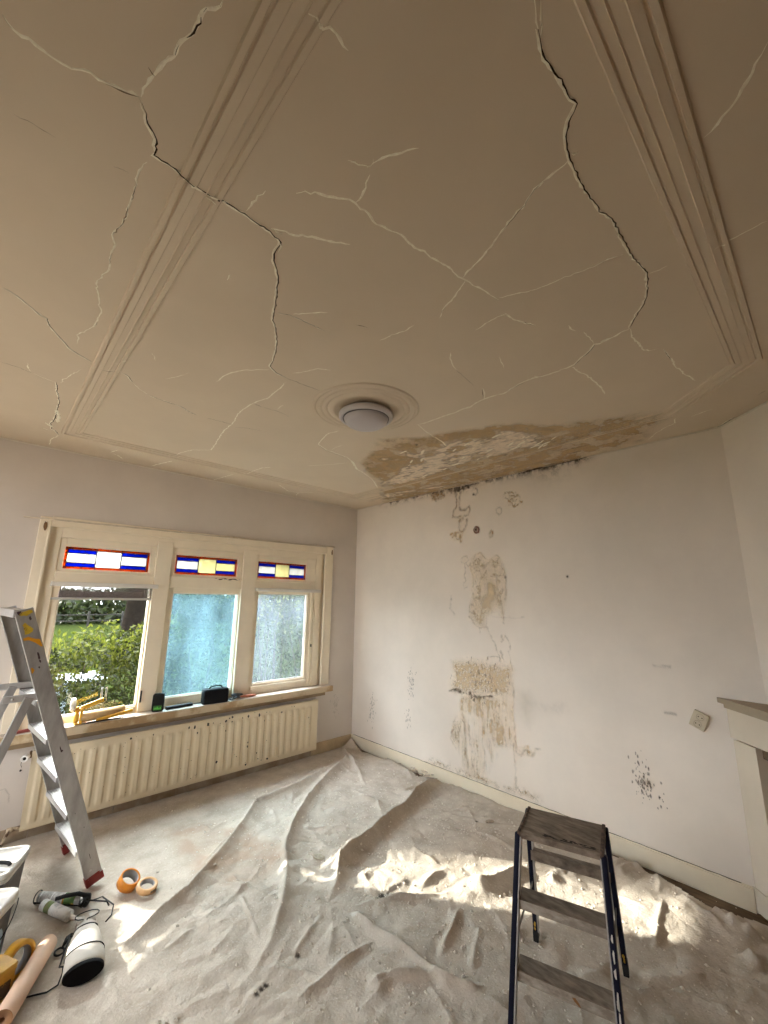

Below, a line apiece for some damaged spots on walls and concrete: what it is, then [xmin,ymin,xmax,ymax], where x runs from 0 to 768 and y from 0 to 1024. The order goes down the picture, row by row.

crack [705,42,768,137]
crack [2,0,350,466]
crack [296,0,694,446]
peeling [382,431,557,497]
damp [367,418,654,542]
damp [450,662,510,742]
damp [628,752,664,808]